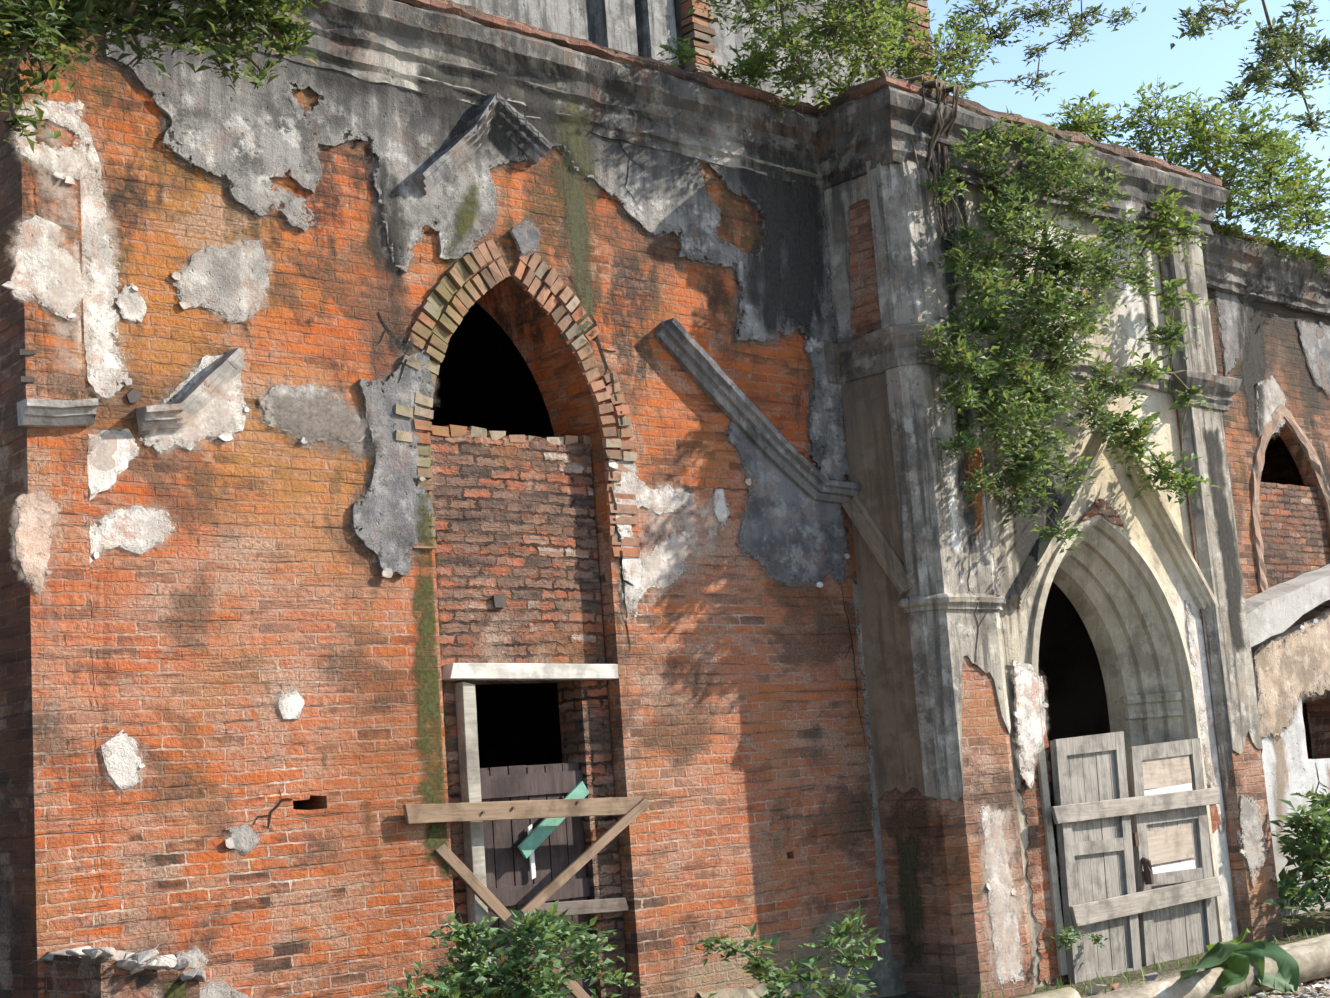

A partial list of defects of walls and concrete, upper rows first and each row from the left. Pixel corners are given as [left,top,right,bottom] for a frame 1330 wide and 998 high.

flaking render [1,99,147,403]
flaking render [103,22,540,274]
damp [369,59,601,357]
flaking render [546,122,850,481]
damp [1182,233,1197,343]
flaking render [14,490,61,600]
flaking render [89,505,175,563]
flaking render [87,372,366,501]
damp [654,318,1245,652]
crack [92,659,101,892]
spalling [980,659,1069,985]
peeling [1252,612,1330,739]